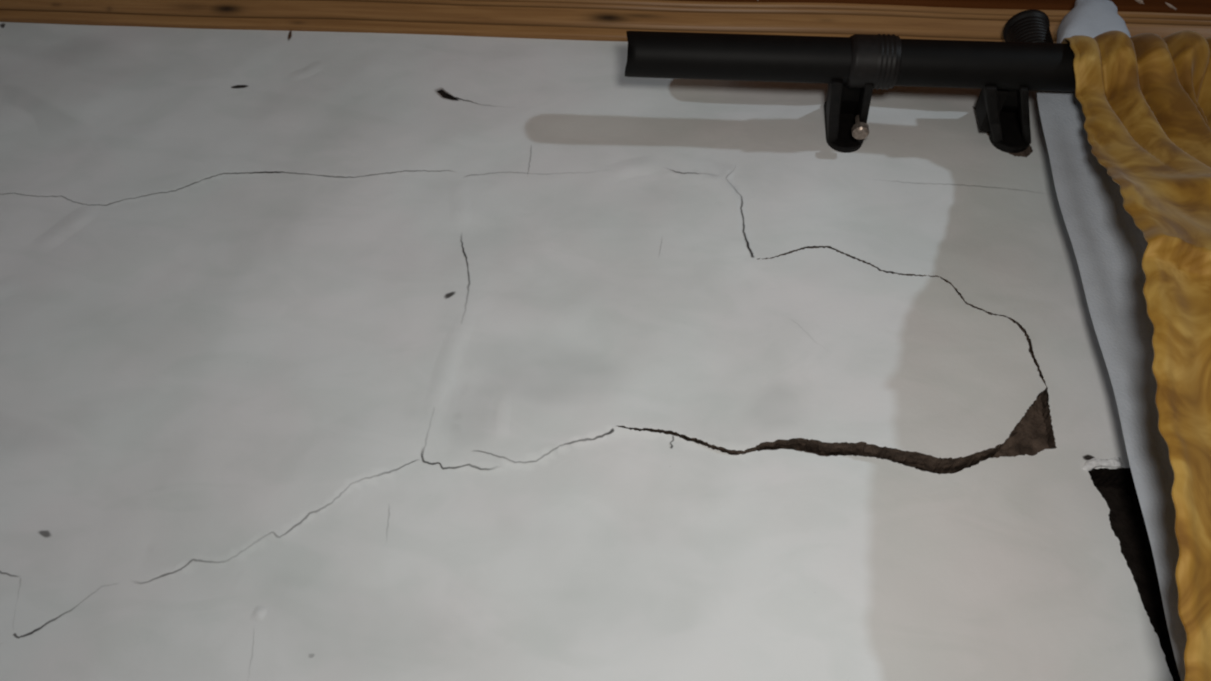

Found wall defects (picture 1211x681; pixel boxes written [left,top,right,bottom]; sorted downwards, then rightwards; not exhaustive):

crack [741,205,1057,474]
crack [422,451,482,469]
crack [14,616,60,638]